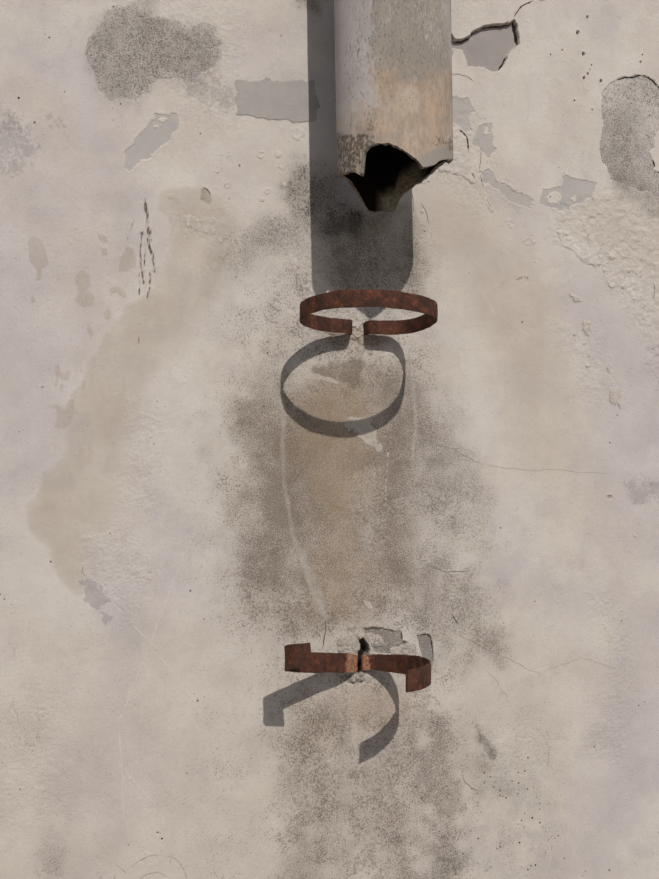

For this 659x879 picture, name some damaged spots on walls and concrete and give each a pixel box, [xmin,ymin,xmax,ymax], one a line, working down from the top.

flaking render [81,0,227,109]
flaking render [451,15,523,75]
peeling [121,109,182,174]
flaking render [452,58,659,214]
damp [251,163,417,290]
damp [237,400,311,620]
flaking render [334,623,437,688]